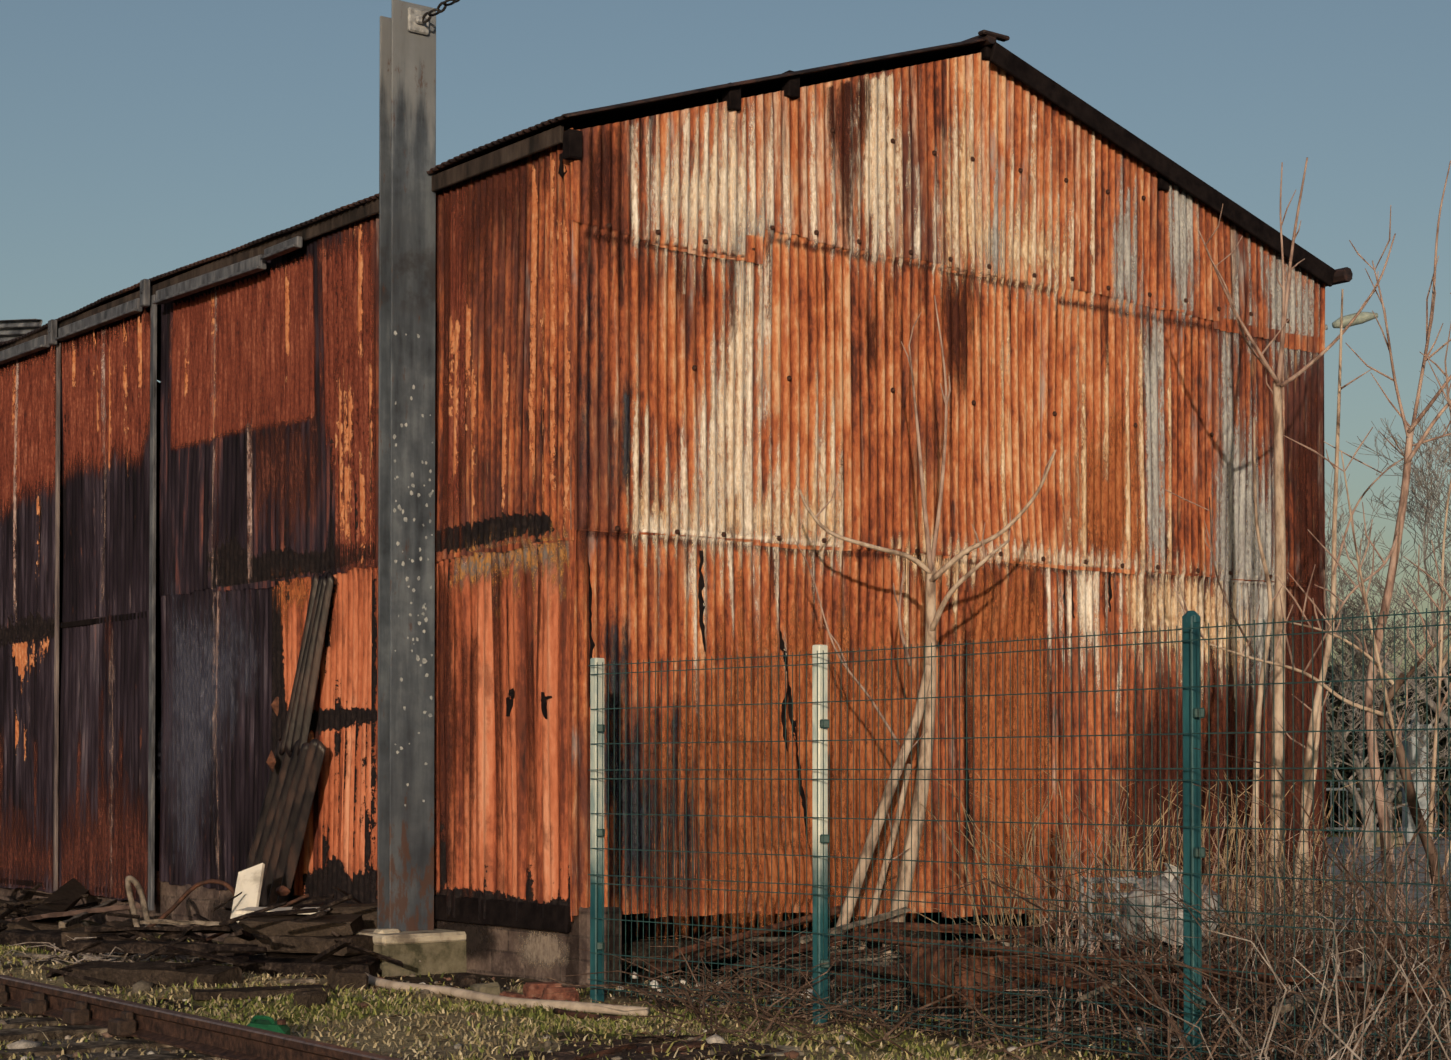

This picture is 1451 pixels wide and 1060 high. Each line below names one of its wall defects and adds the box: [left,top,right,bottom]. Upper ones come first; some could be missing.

corrosion [435,147,558,546]
corrosion [271,697,279,716]
corrosion [276,577,310,641]
corrosion [434,560,509,893]
corrosion [527,558,541,854]
corrosion [580,79,1326,936]
damp [1046,557,1123,710]